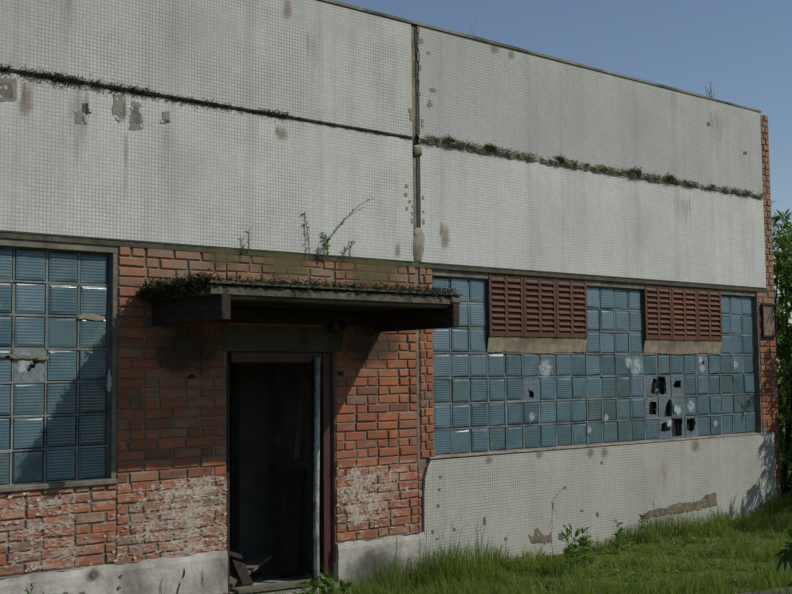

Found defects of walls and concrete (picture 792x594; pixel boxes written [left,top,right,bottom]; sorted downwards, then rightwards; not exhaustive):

peeling [0,75,17,102]
peeling [74,103,93,125]
peeling [112,95,145,130]
peeling [0,487,91,572]
peeling [103,475,228,562]
peeling [336,465,408,532]
peeling [528,528,563,544]
spalling [644,492,717,519]